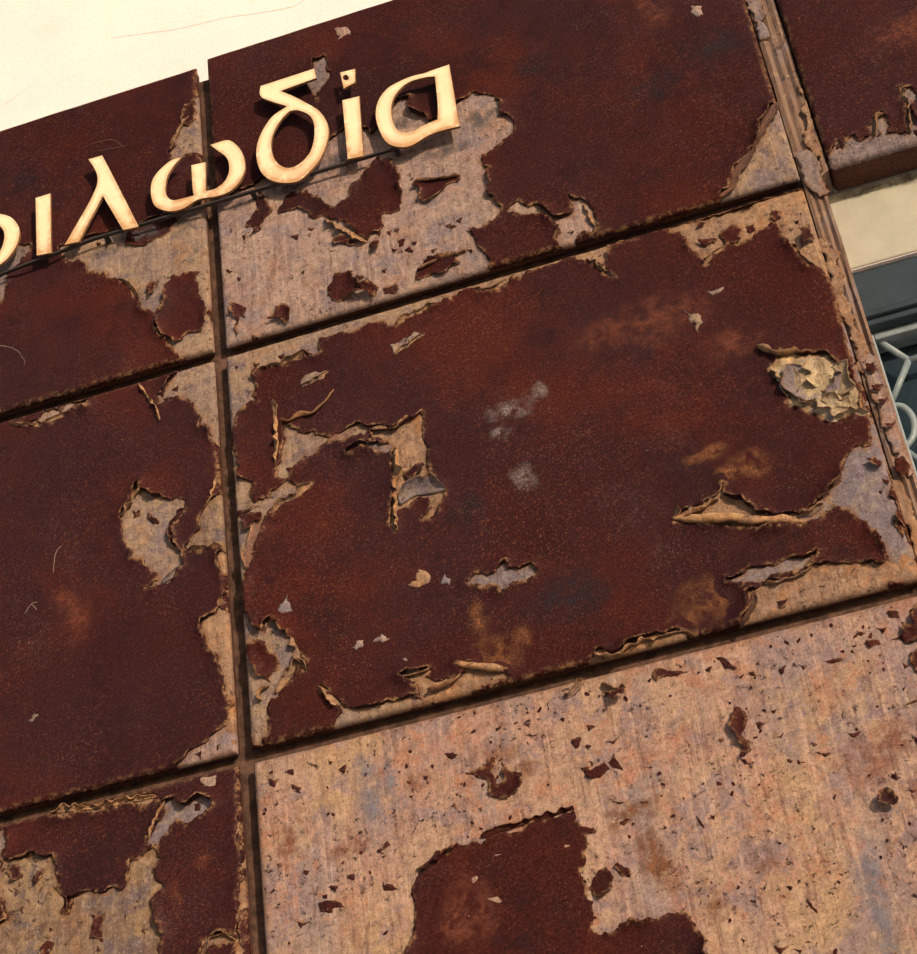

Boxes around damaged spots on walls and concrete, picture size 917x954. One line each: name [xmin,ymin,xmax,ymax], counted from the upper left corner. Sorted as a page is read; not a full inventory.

crack [113,0,304,38]
peeling [307,57,330,96]
peeling [0,244,31,301]
peeling [60,93,615,447]
peeling [10,401,86,427]
peeling [233,84,917,954]
peeling [120,474,239,769]
peeling [0,775,217,954]
peeling [201,932,244,954]